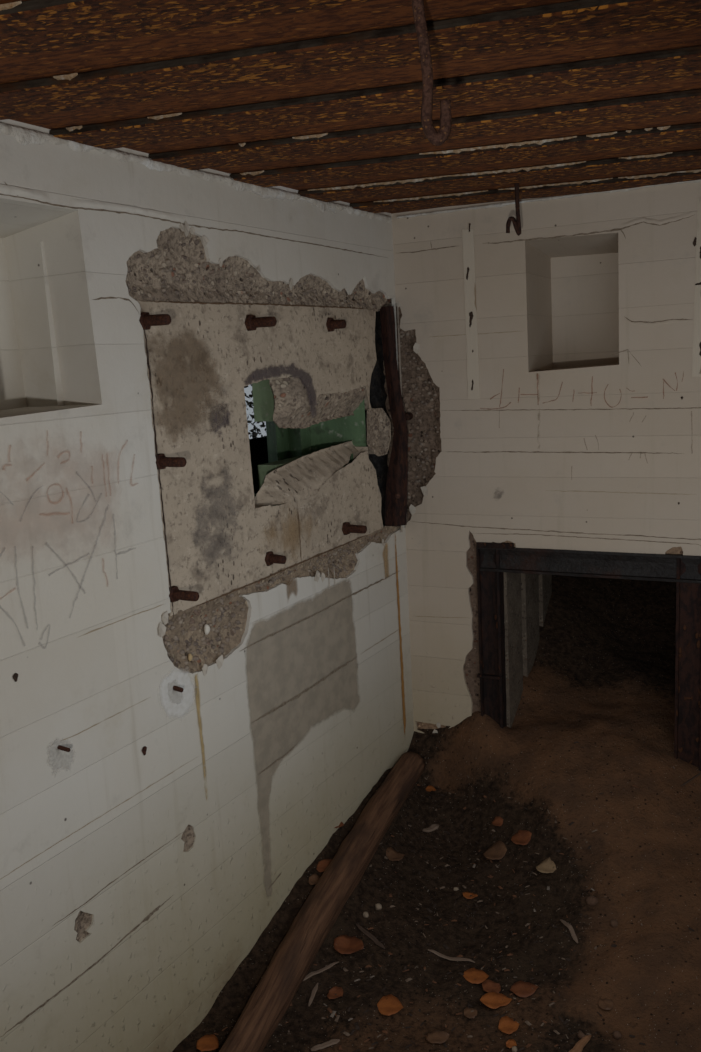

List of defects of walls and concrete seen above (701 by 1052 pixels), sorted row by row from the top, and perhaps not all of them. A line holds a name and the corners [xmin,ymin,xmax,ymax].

peeling [126,221,446,896]
rust [383,536,406,733]
spalling [464,532,481,713]
rust [195,676,206,777]
peeling [74,911,92,942]